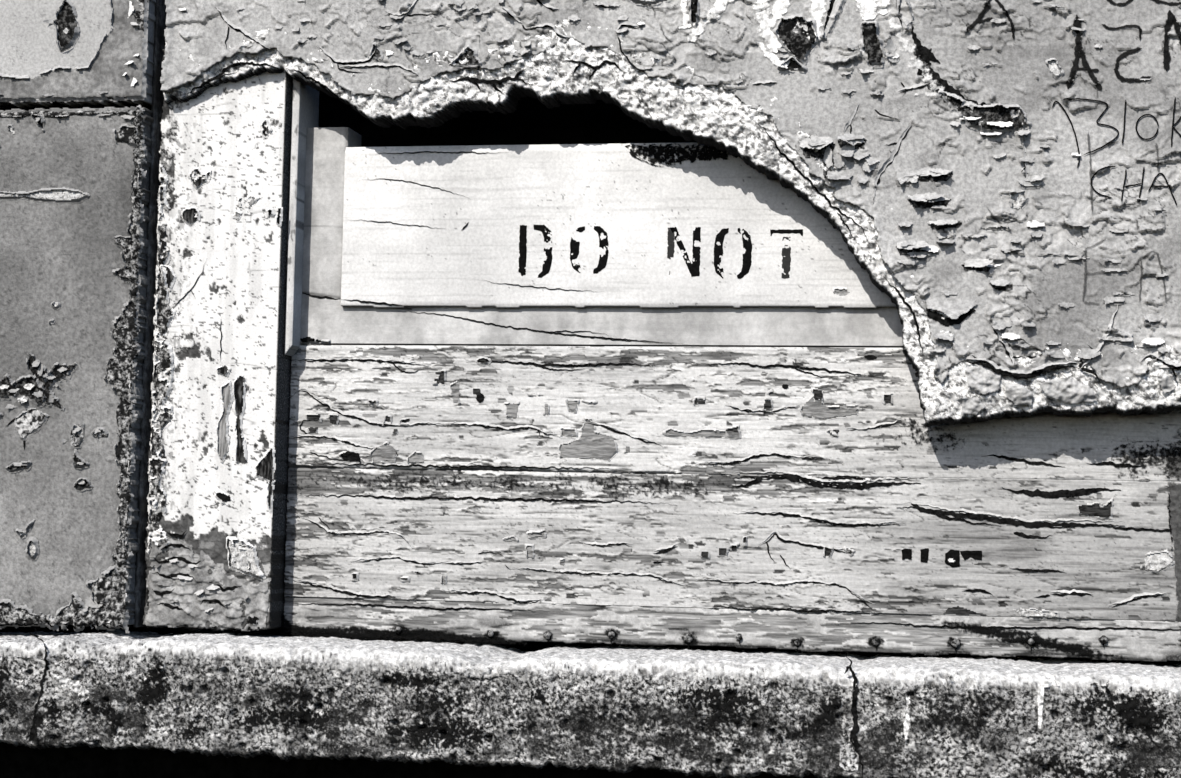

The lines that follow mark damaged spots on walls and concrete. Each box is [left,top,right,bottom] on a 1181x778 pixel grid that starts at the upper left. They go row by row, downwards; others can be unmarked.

peeling [0,0,149,132]
spalling [163,0,1181,427]
peeling [0,353,77,472]
peeling [144,164,271,631]
peeling [559,399,630,461]
peeling [662,425,741,439]
peeling [800,387,858,436]
peeling [1076,497,1114,520]
leakage [1111,432,1181,634]
crack [27,629,52,740]
leakage [50,672,89,699]
leakage [1037,683,1059,729]